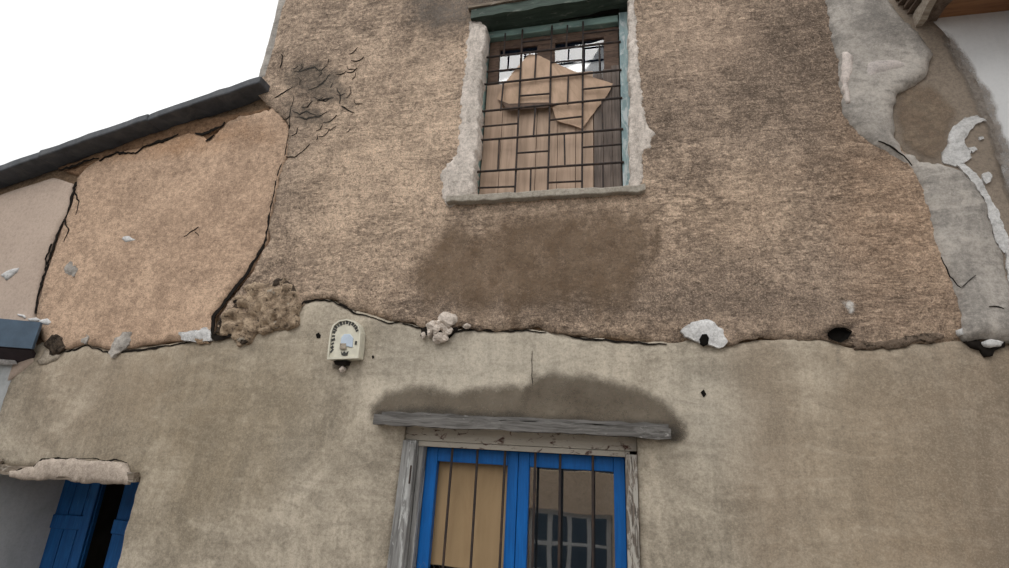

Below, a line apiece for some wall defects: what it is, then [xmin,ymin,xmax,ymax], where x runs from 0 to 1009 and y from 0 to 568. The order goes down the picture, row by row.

crack [64,47,364,354]
peeling [956,163,1009,283]
crack [34,182,80,314]
water stain [417,211,658,316]
spalling [213,277,302,347]
crack [301,299,421,328]
crack [455,326,543,334]
crack [570,336,667,345]
spalling [851,332,944,350]
spalling [956,328,1005,357]
spalling [9,458,131,485]